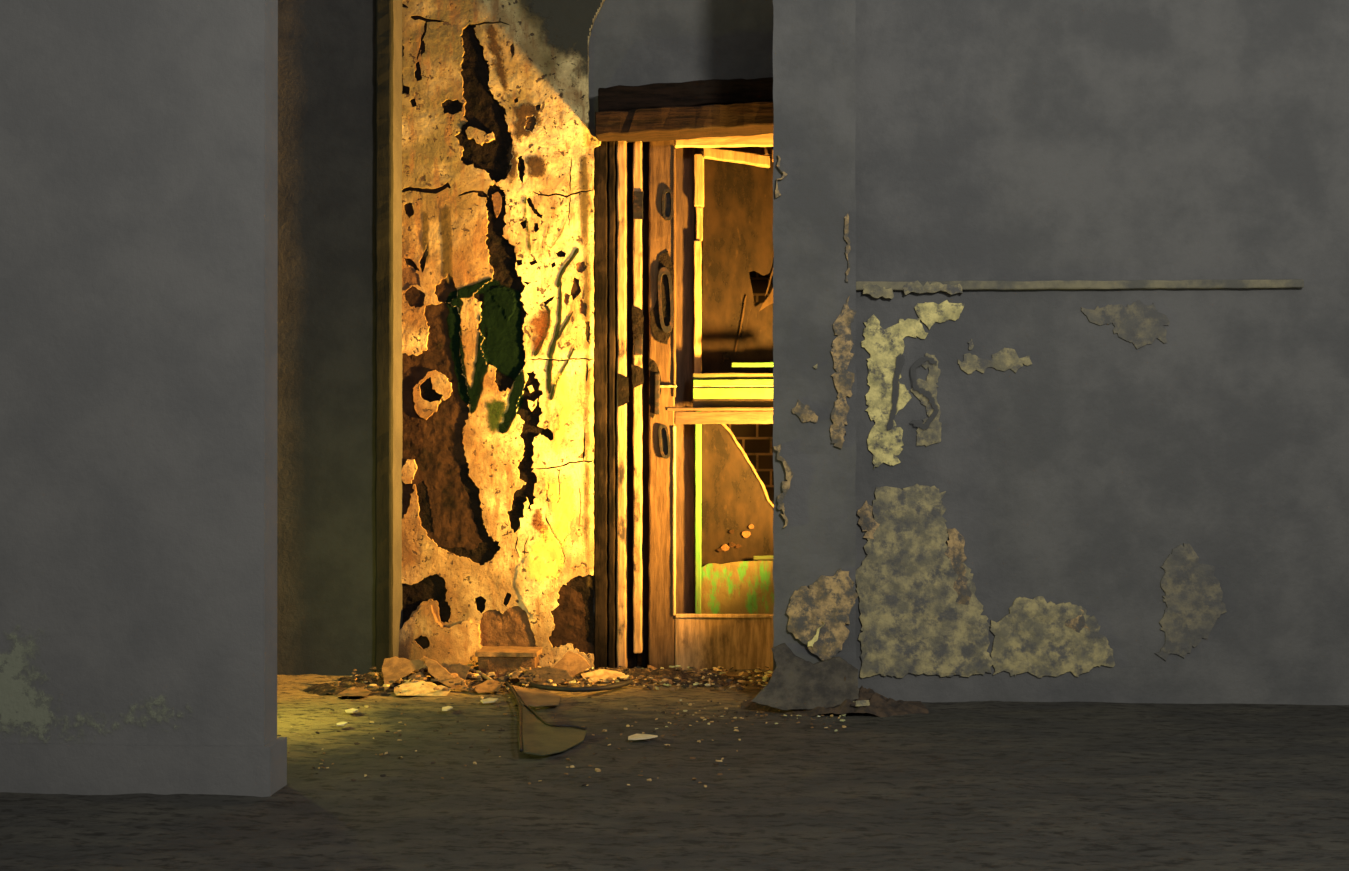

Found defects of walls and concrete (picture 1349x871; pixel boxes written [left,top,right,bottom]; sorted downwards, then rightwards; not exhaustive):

peeling [402,41,425,107]
peeling [404,203,414,218]
flaking render [442,25,591,533]
peeling [792,214,965,470]
peeling [958,339,1032,374]
flaking render [402,252,501,565]
flaking render [402,574,451,627]
flaking render [475,574,594,655]
peeling [786,484,1115,678]